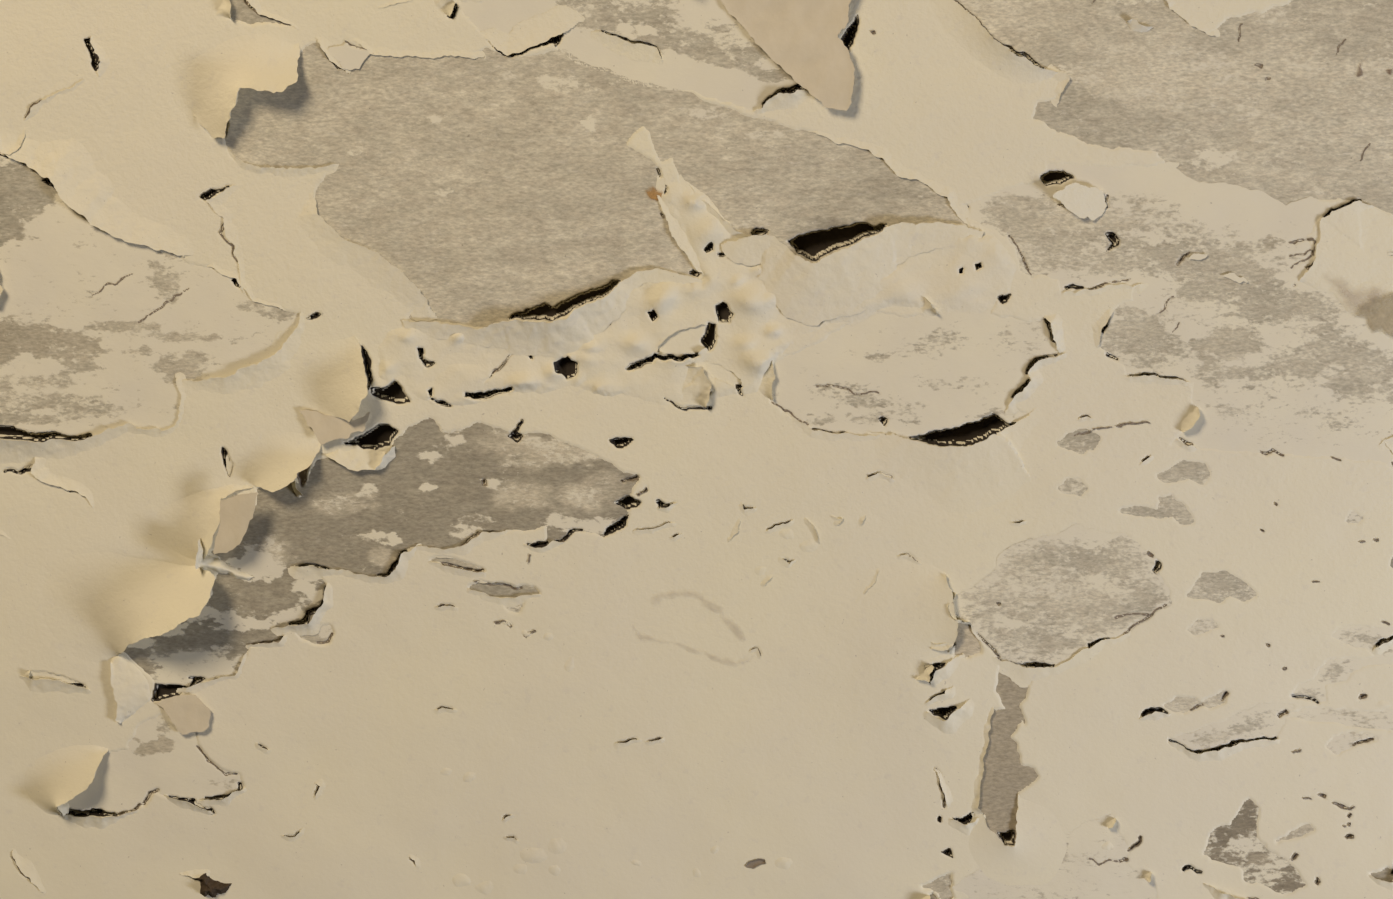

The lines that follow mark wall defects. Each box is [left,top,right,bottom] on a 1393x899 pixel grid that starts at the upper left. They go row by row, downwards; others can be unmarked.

peeling [0,129,311,471]
peeling [180,0,1393,525]
peeling [67,418,647,816]
peeling [916,524,1256,899]
peeling [1204,799,1320,895]
peeling [1138,621,1393,762]
peeling [1303,794,1355,839]